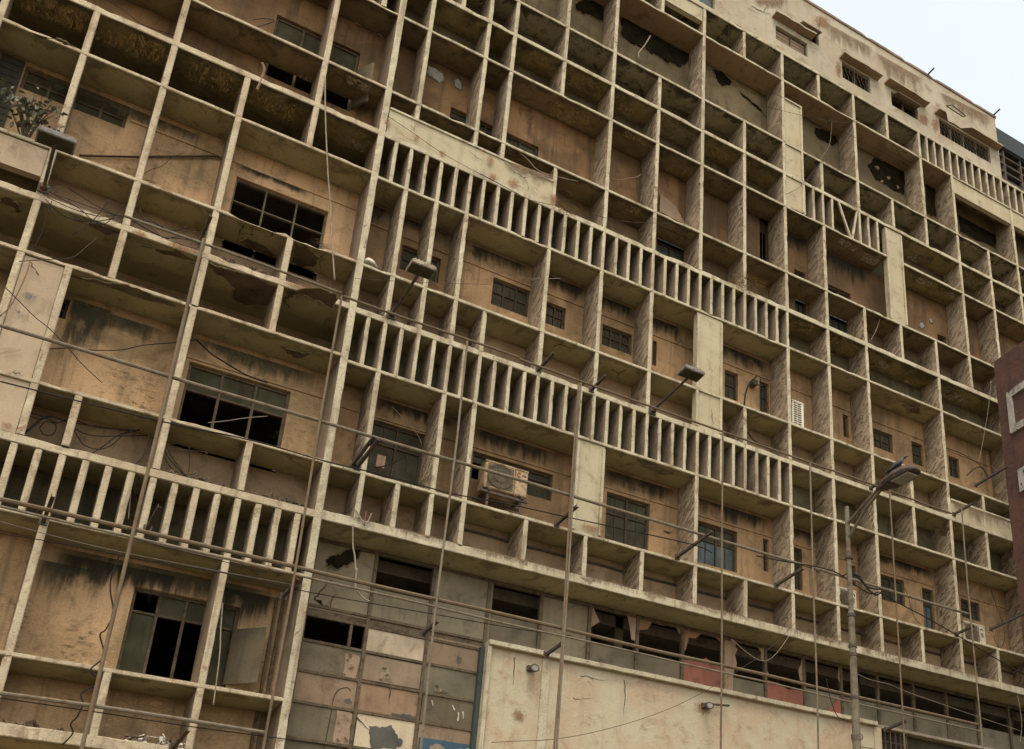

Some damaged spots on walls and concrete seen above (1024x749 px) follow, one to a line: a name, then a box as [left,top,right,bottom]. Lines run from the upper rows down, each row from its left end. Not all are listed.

peeling [784,61,914,161]
leakage [66,300,153,340]
leakage [479,430,547,459]
leakage [43,550,211,596]